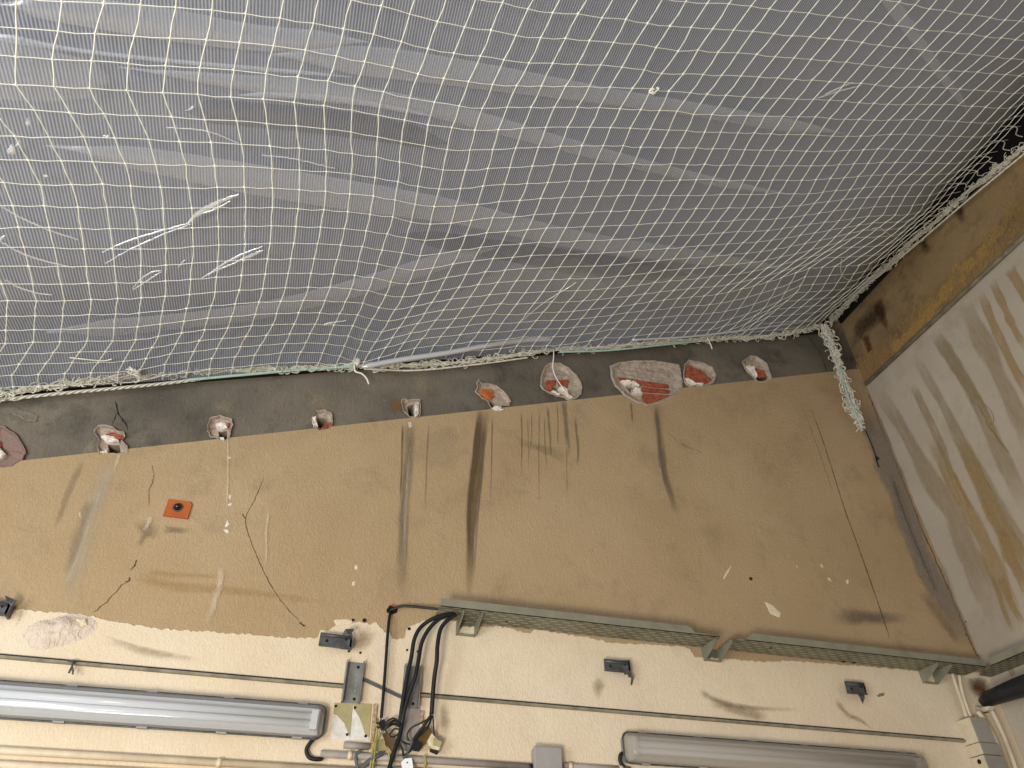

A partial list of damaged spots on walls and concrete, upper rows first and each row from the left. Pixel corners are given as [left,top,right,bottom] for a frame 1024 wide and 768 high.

flaking render [475,379,512,412]
flaking render [540,362,583,401]
flaking render [610,360,717,406]
flaking render [742,355,772,383]
flaking render [94,424,128,455]
flaking render [207,415,233,442]
flaking render [312,410,333,431]
leakage [656,416,671,493]
leakage [467,422,492,559]
leakage [863,425,959,616]
crack [242,478,305,627]
crack [94,560,137,612]